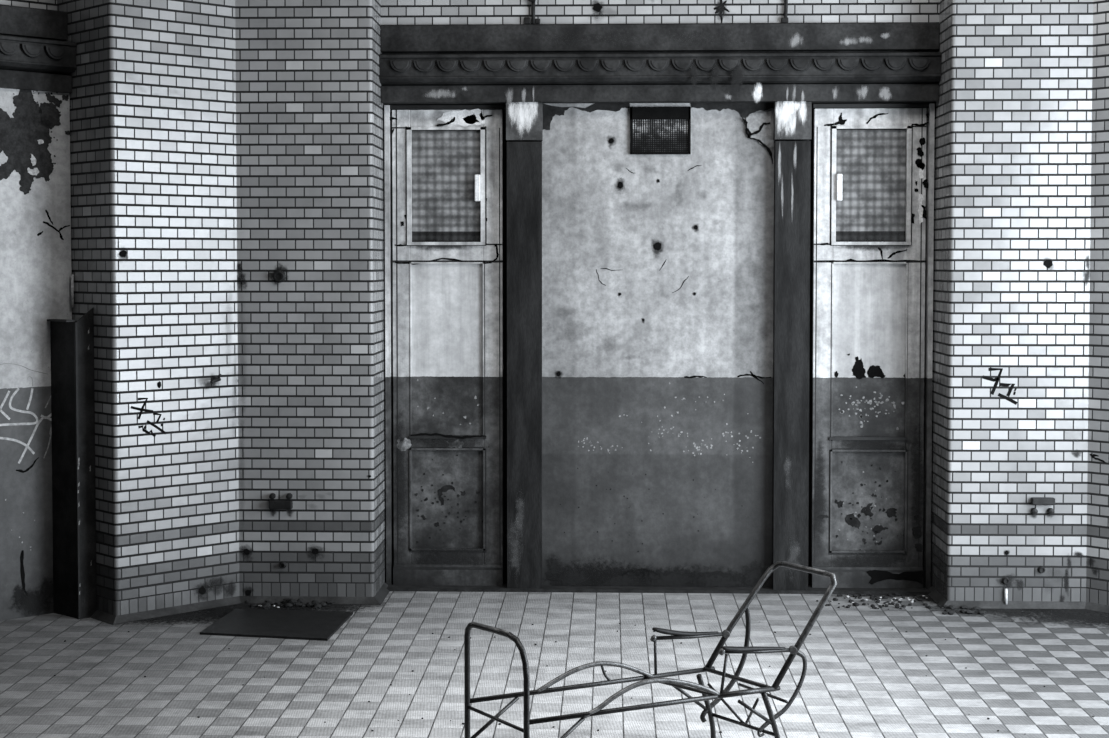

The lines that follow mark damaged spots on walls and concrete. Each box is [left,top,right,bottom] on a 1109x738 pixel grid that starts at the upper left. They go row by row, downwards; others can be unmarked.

peeling [0,89,71,195]
crack [742,118,773,164]
crack [37,210,70,240]
peeling [839,354,905,428]
peeling [835,465,923,552]